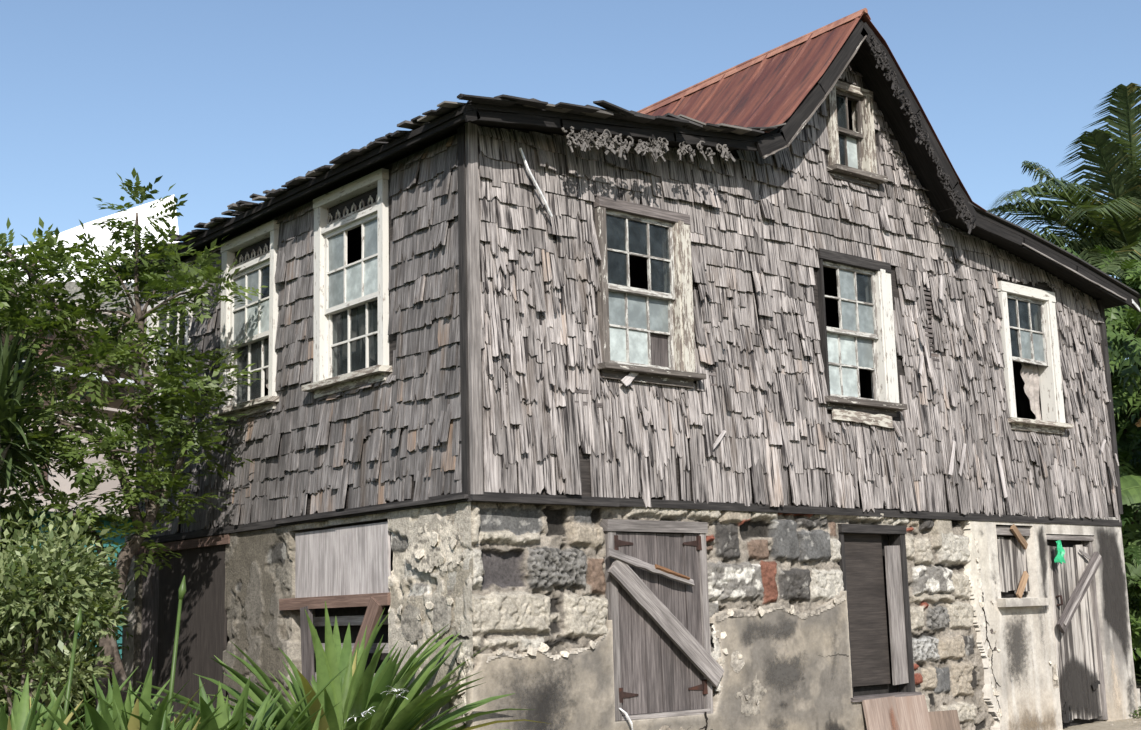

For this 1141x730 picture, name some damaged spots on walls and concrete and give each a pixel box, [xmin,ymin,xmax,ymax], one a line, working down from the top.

flaking render [406,519,464,573]
flaking render [397,596,454,643]
damp [744,620,795,644]
spalling [974,537,1005,722]
damp [513,671,571,730]
damp [766,656,801,692]